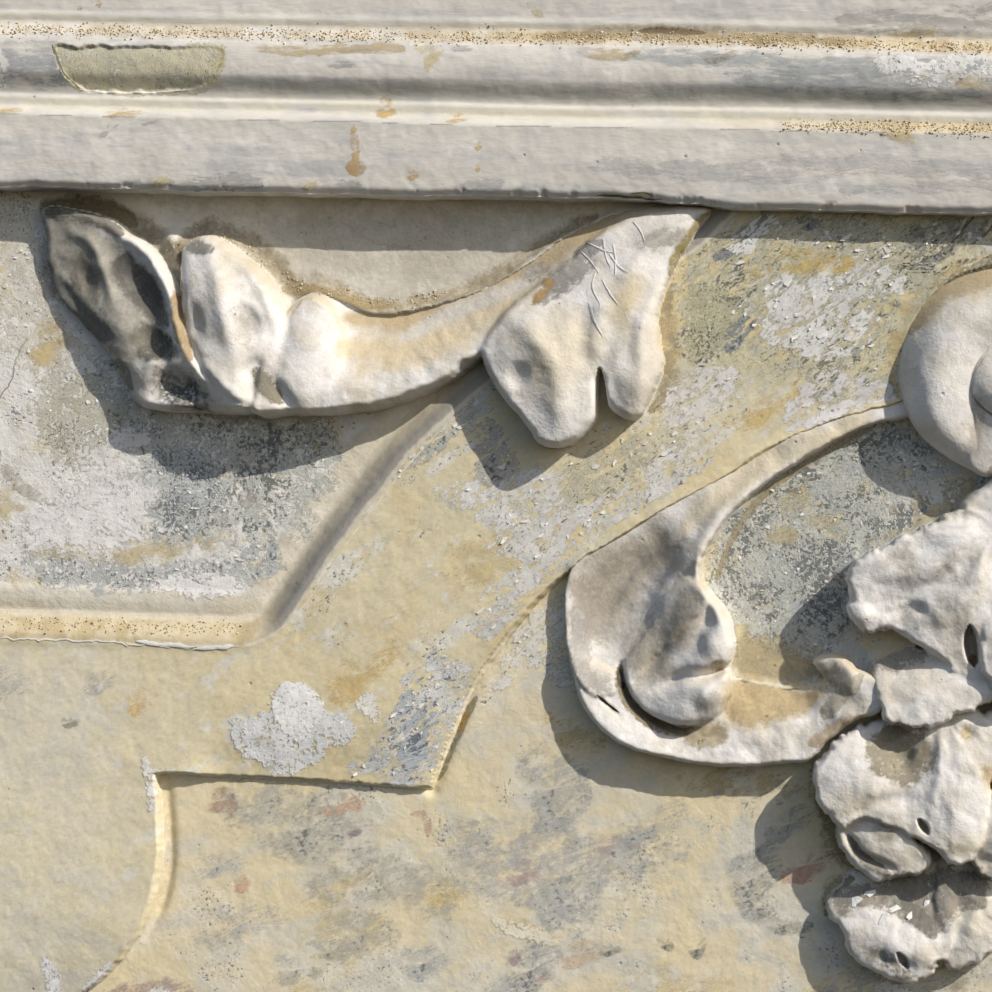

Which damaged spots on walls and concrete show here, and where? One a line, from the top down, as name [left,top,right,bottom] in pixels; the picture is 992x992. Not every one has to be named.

spalling [52,41,227,97]
peeling [873,52,992,88]
crack [0,337,28,398]
peeling [0,196,342,597]
peeling [392,212,992,658]
peeling [346,649,473,787]
water stain [878,722,913,741]